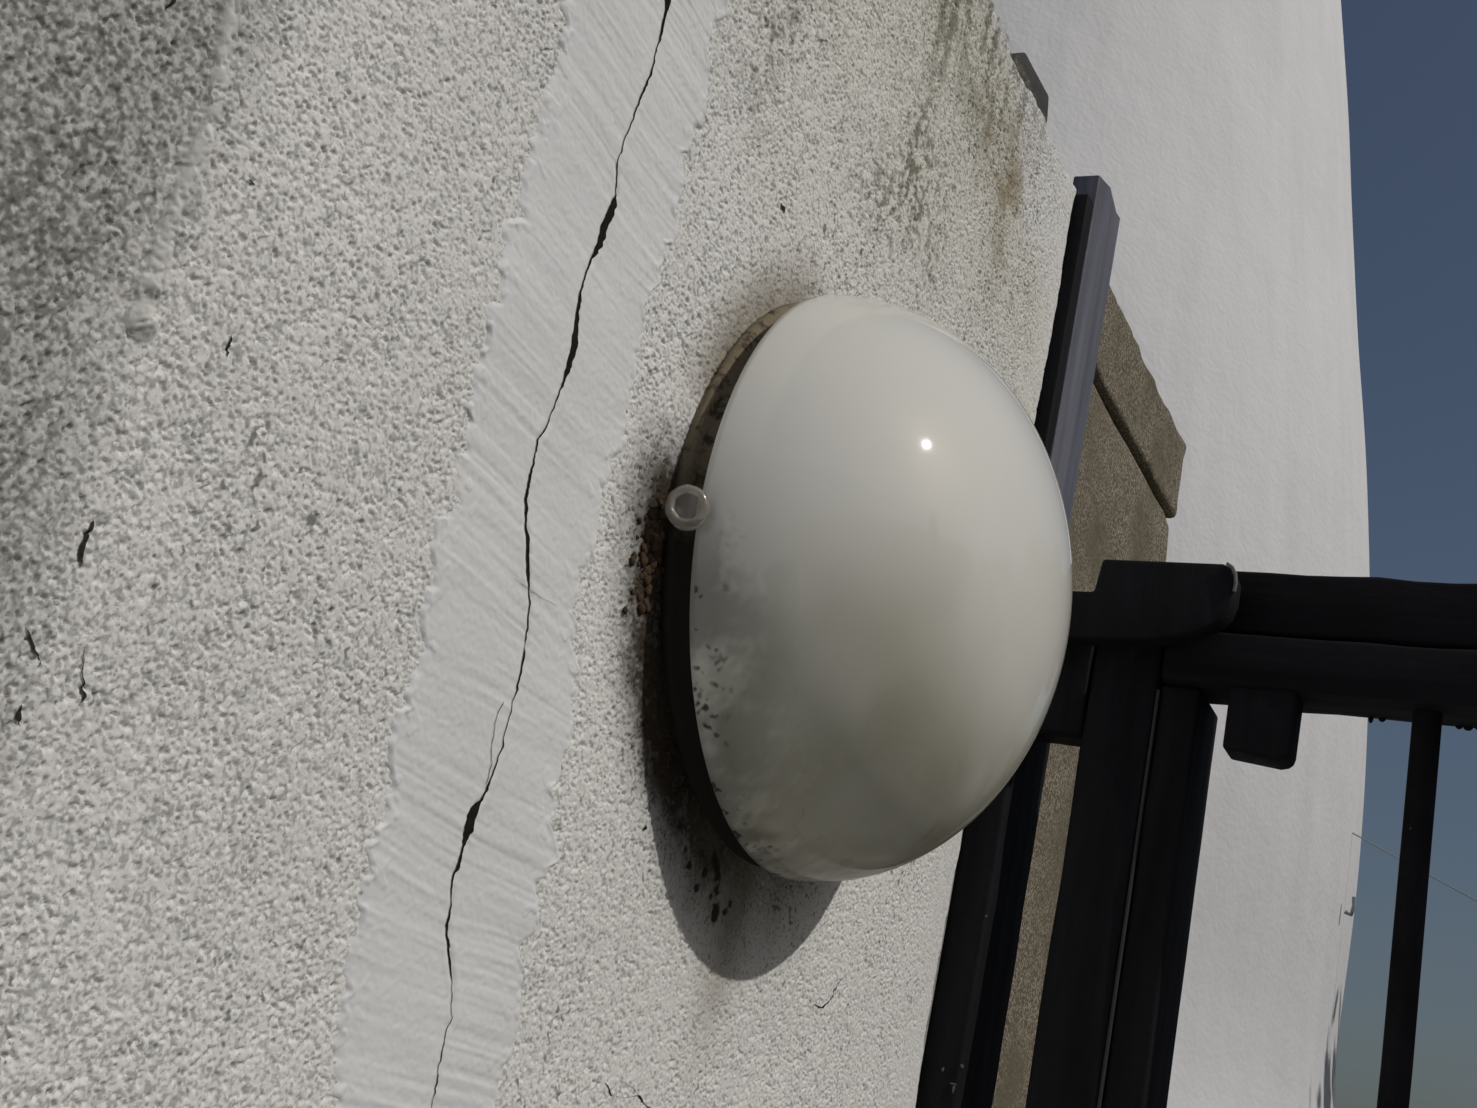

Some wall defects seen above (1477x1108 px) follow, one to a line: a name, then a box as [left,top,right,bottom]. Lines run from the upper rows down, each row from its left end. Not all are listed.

crack [432,0,671,1108]